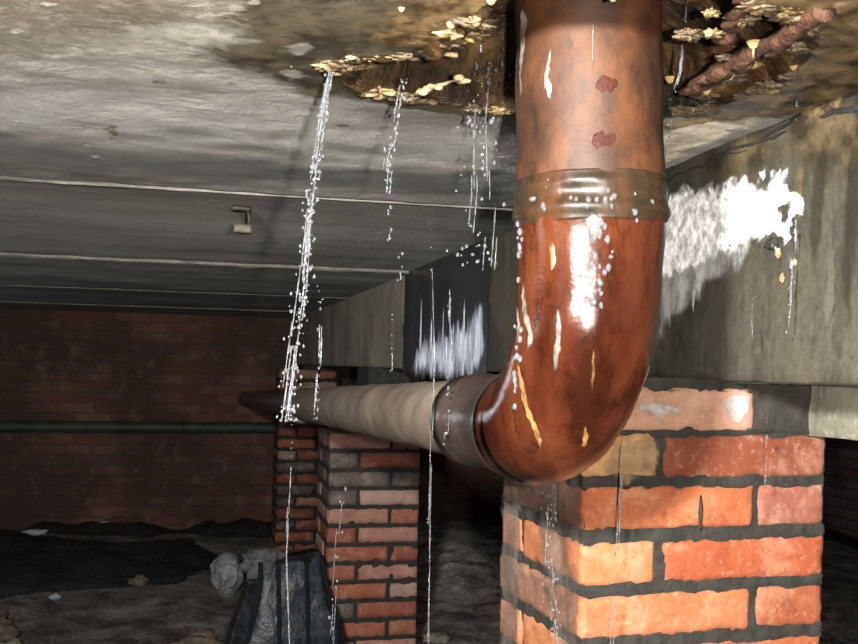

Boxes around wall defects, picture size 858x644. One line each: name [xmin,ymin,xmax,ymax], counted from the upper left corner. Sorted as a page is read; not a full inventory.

damp [198,0,432,98]
spalling [311,0,516,116]
rust [369,0,488,46]
damp [372,74,498,118]
spalling [662,0,842,165]
rust [677,0,837,98]
damp [696,0,858,122]
damp [654,170,804,346]